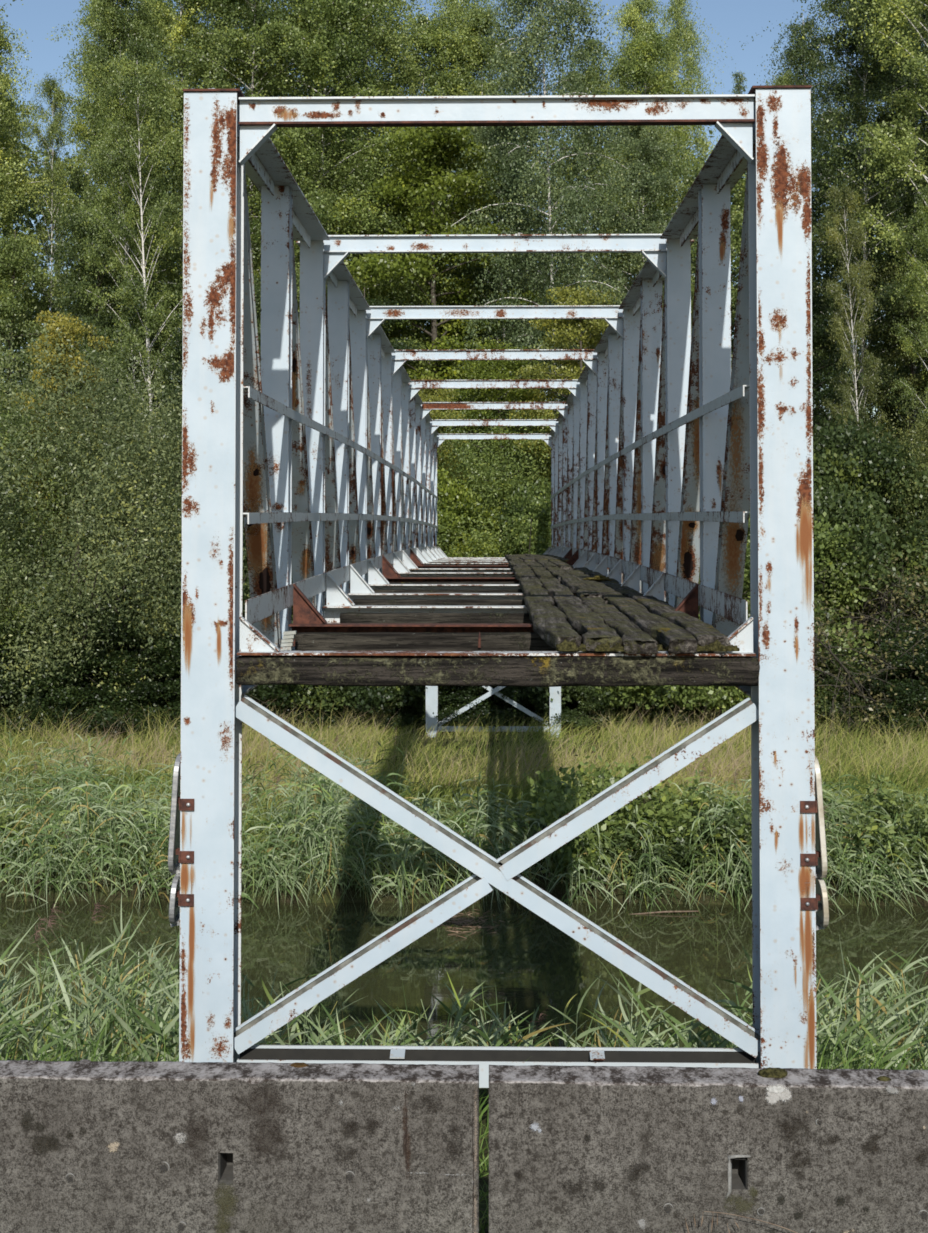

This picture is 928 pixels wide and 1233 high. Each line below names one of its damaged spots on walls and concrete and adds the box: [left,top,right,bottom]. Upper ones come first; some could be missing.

corrosion [274,100,361,121]
corrosion [183,94,260,383]
corrosion [574,90,812,600]
corrosion [182,575,199,669]
corrosion [182,403,200,520]
corrosion [209,449,305,690]
corrosion [300,507,330,578]
corrosion [799,814,815,849]
corrosion [180,863,231,1060]
corrosion [770,823,815,1069]